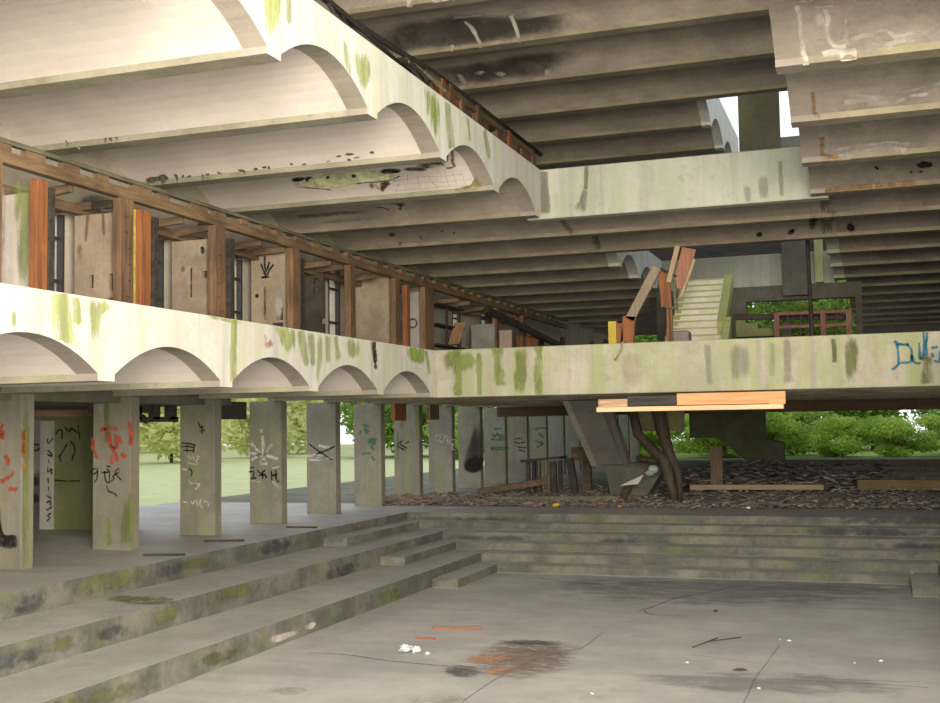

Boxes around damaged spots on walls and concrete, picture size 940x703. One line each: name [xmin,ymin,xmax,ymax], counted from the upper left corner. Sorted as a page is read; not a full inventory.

water stain [455,15,486,48]
water stain [503,7,525,44]
spalling [292,151,444,190]
water stain [52,293,81,343]
water stain [453,349,462,395]
water stain [492,348,504,385]
water stain [534,346,542,395]
water stain [464,456,484,473]